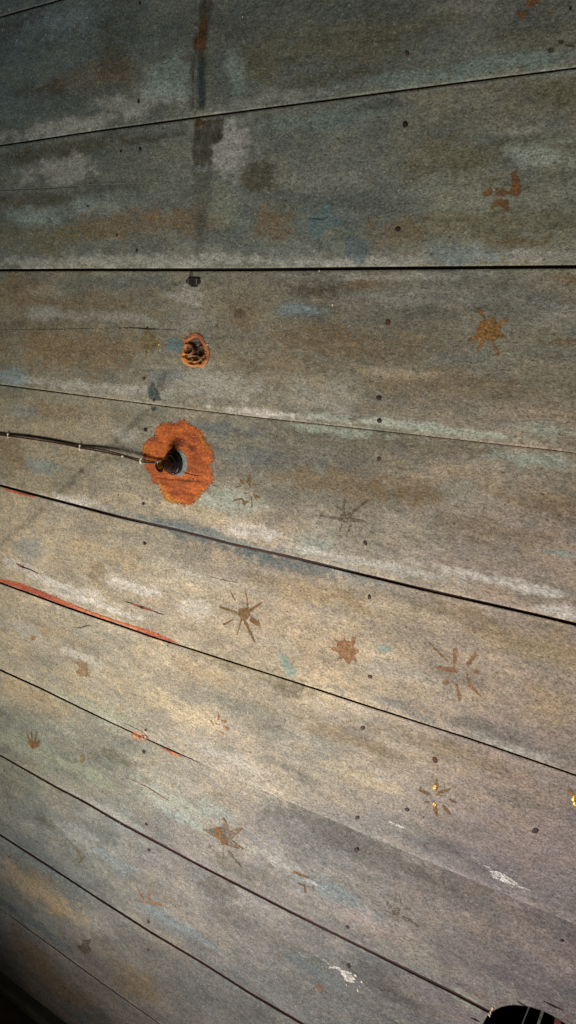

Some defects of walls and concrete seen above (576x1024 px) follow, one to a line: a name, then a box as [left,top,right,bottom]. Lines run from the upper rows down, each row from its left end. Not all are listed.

leakage [192,0,223,166]
rust [482,172,520,210]